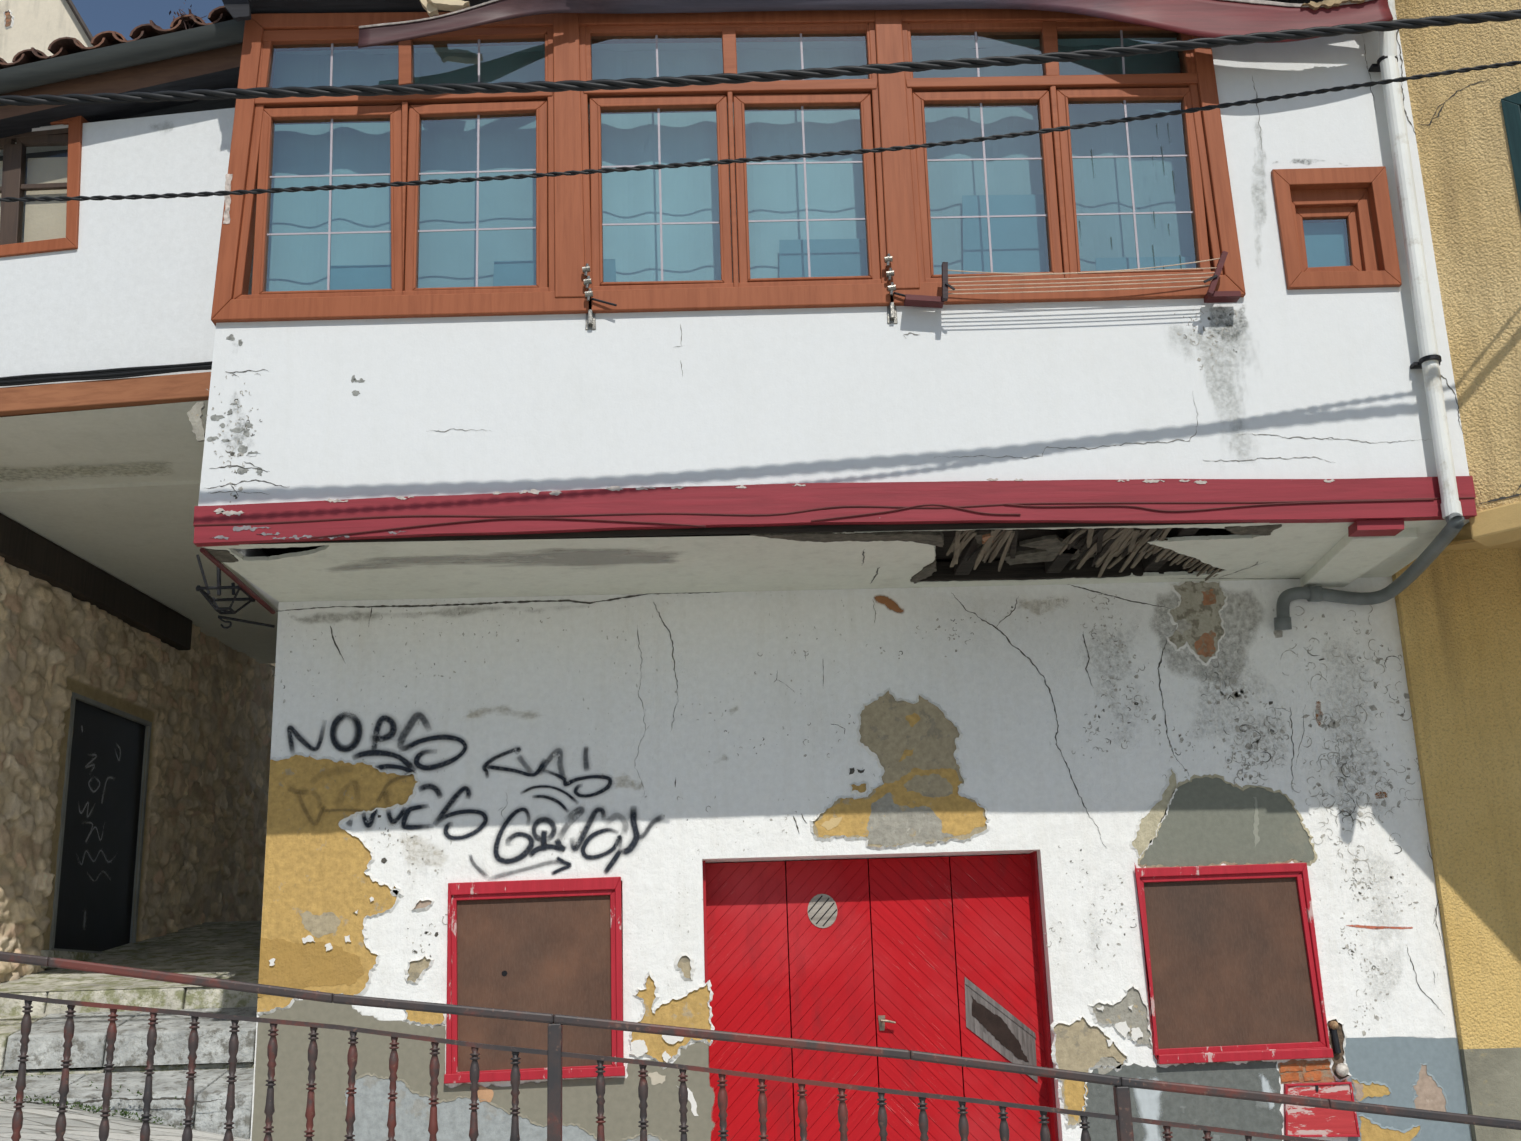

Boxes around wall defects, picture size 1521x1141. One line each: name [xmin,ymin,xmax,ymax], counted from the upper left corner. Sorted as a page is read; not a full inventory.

leakage [207,403,263,476]
crack [934,375,1462,462]
peeling [257,752,435,1016]
crack [276,592,717,796]
peeling [809,687,990,851]
crack [952,593,1105,846]
flaking render [1129,767,1178,858]
flaking render [1165,581,1228,666]
peeling [403,952,447,1029]
peeling [628,952,715,1116]
peeling [1050,983,1153,1130]